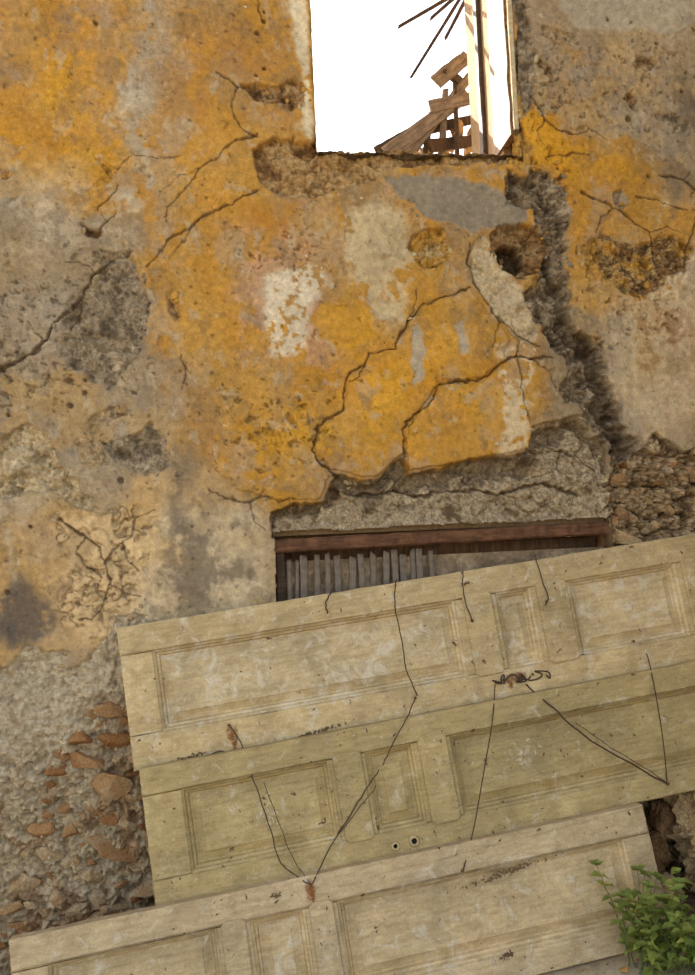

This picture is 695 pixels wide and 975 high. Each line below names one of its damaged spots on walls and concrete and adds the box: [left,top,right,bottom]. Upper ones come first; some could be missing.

crack [0,259,116,374]
crack [180,353,194,390]
crack [96,72,283,269]
crack [312,242,598,500]
spalling [240,0,695,547]
crack [580,171,695,270]
spalling [0,402,177,975]
spalling [638,798,664,830]
spalling [664,834,686,878]